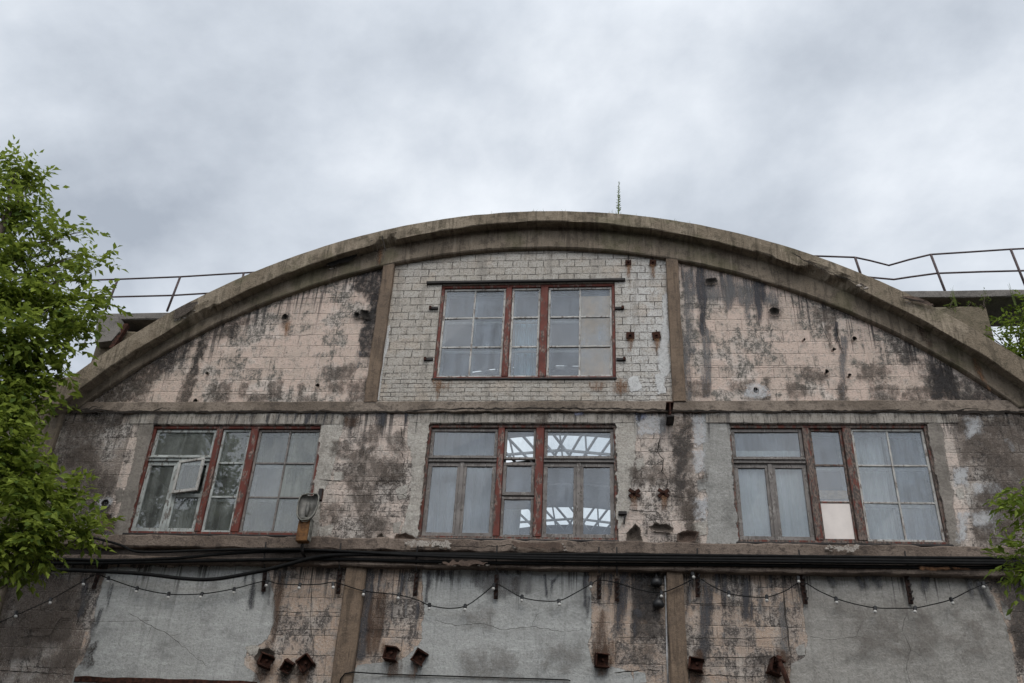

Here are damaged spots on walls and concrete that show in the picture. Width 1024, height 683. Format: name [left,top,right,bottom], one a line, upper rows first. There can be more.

water stain [48,313,257,521]
water stain [211,380,283,422]
water stain [266,248,408,538]
water stain [682,267,779,401]
water stain [786,367,828,397]
water stain [815,308,1000,401]
water stain [628,413,708,543]
crack [0,613,205,675]
crack [437,614,585,633]
water stain [608,572,665,664]
water stain [685,574,772,658]